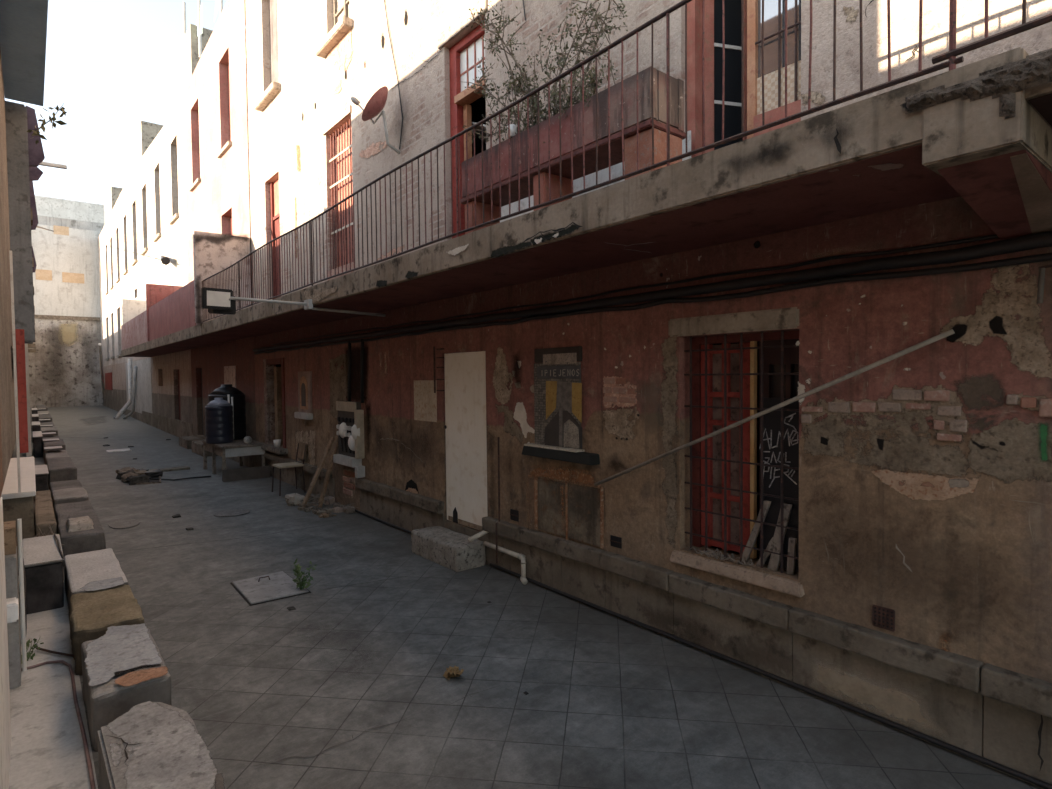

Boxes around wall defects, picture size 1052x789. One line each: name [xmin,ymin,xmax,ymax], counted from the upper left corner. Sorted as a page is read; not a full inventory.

flaking render [327,29,353,95]
spalling [900,50,1052,120]
flaking render [940,263,1052,380]
flaking render [492,347,535,443]
flaking render [602,366,640,440]
flaking render [797,374,1052,501]
crack [1037,715,1045,770]